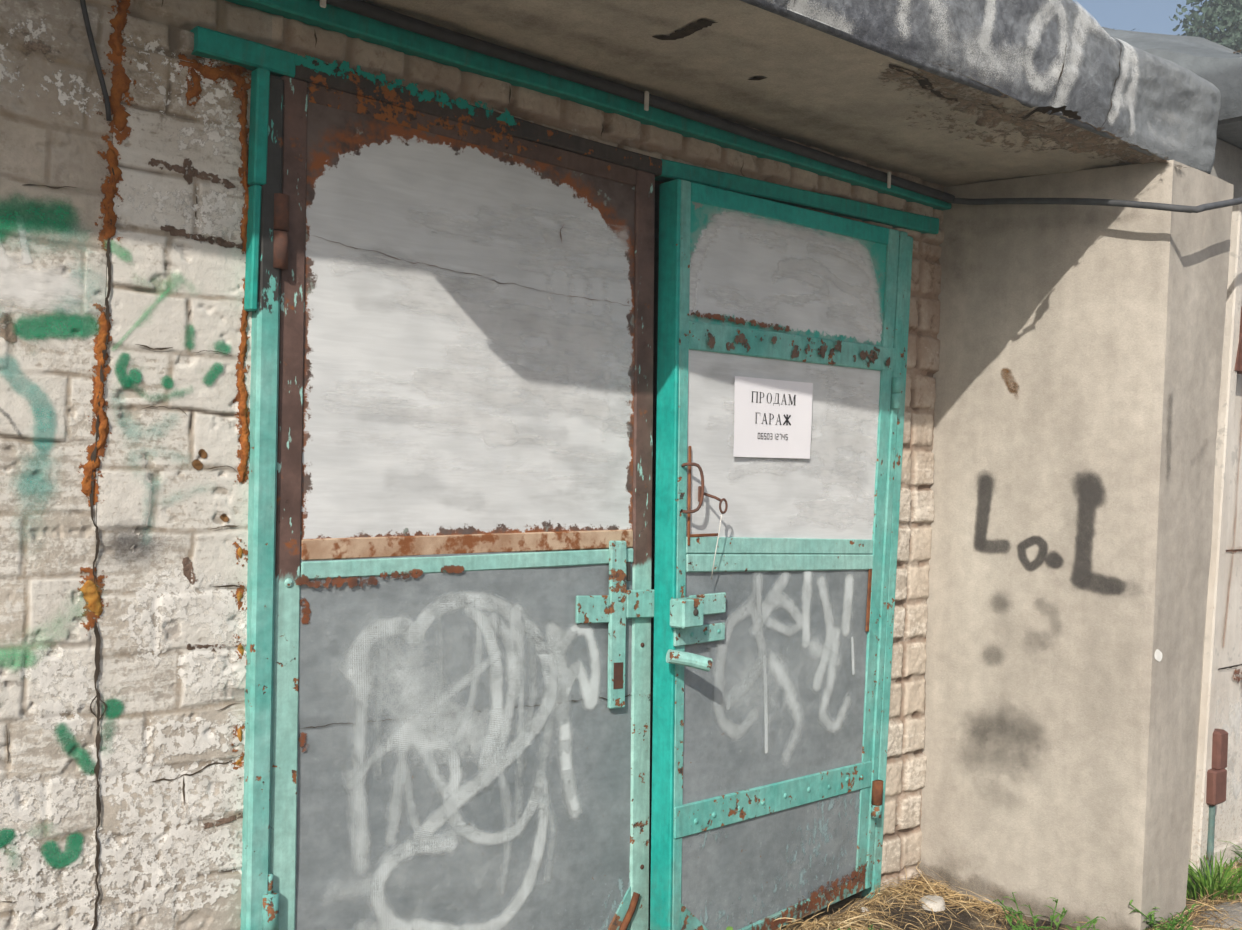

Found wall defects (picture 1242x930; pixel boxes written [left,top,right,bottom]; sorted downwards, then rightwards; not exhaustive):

peeling [0,16,103,124]
crack [25,182,76,190]
crack [90,152,231,582]
corrosion [691,310,791,353]
corrosion [791,339,891,368]
corrosion [1002,368,1019,393]
corrosion [295,529,633,624]
crack [90,620,107,930]
crack [152,760,233,804]
corrosion [750,861,868,930]